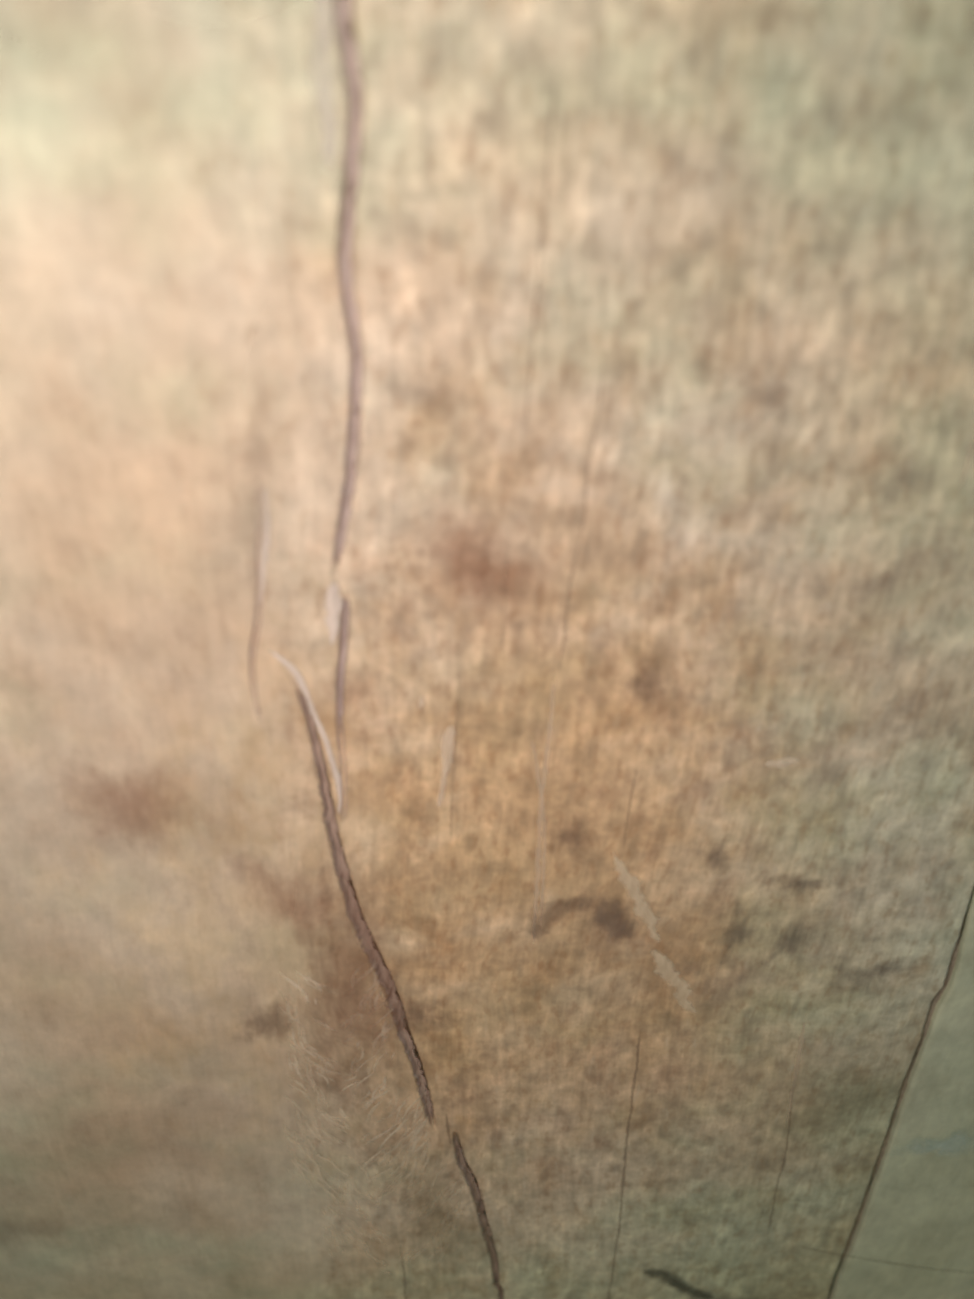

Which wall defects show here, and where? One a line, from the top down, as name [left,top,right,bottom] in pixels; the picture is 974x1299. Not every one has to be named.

crack [249,0,503,1299]
damp [645,1271,712,1299]